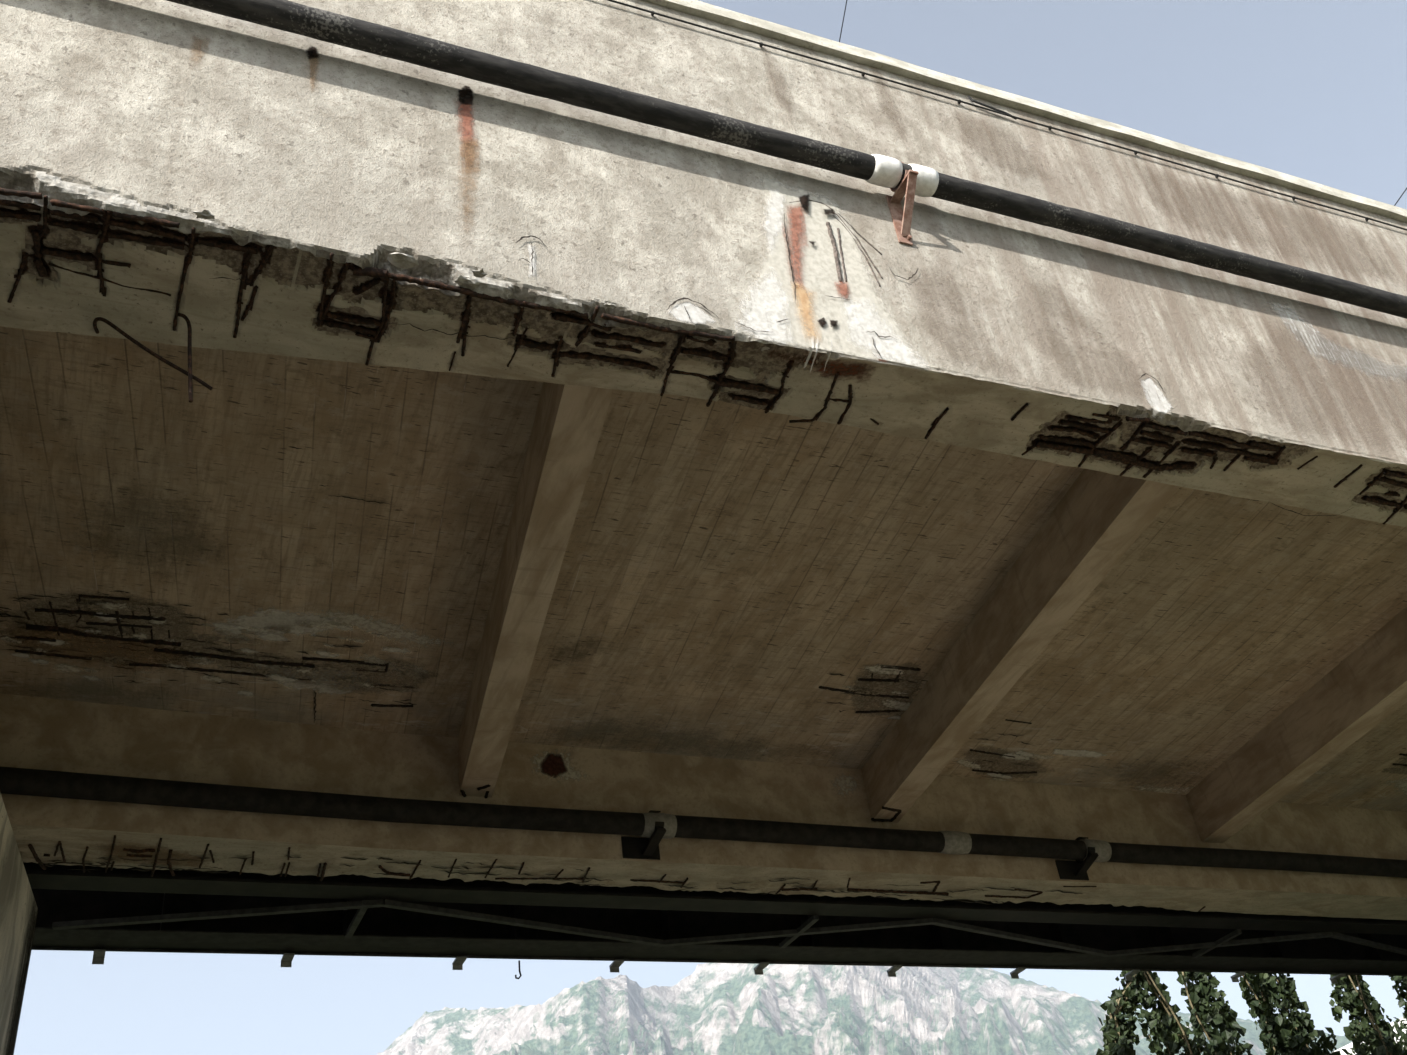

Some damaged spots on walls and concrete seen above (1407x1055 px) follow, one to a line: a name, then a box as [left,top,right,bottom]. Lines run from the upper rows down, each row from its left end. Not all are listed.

corrosion [458,86,477,180]
spalling [0,169,883,425]
corrosion [788,206,815,336]
spalling [925,407,949,439]
spalling [1021,405,1318,478]
spalling [1334,464,1407,525]
spalling [0,590,440,721]
spalling [819,663,928,719]
spalling [28,835,255,877]
spalling [317,857,613,886]
spalling [630,874,697,890]
spalling [718,878,1097,905]